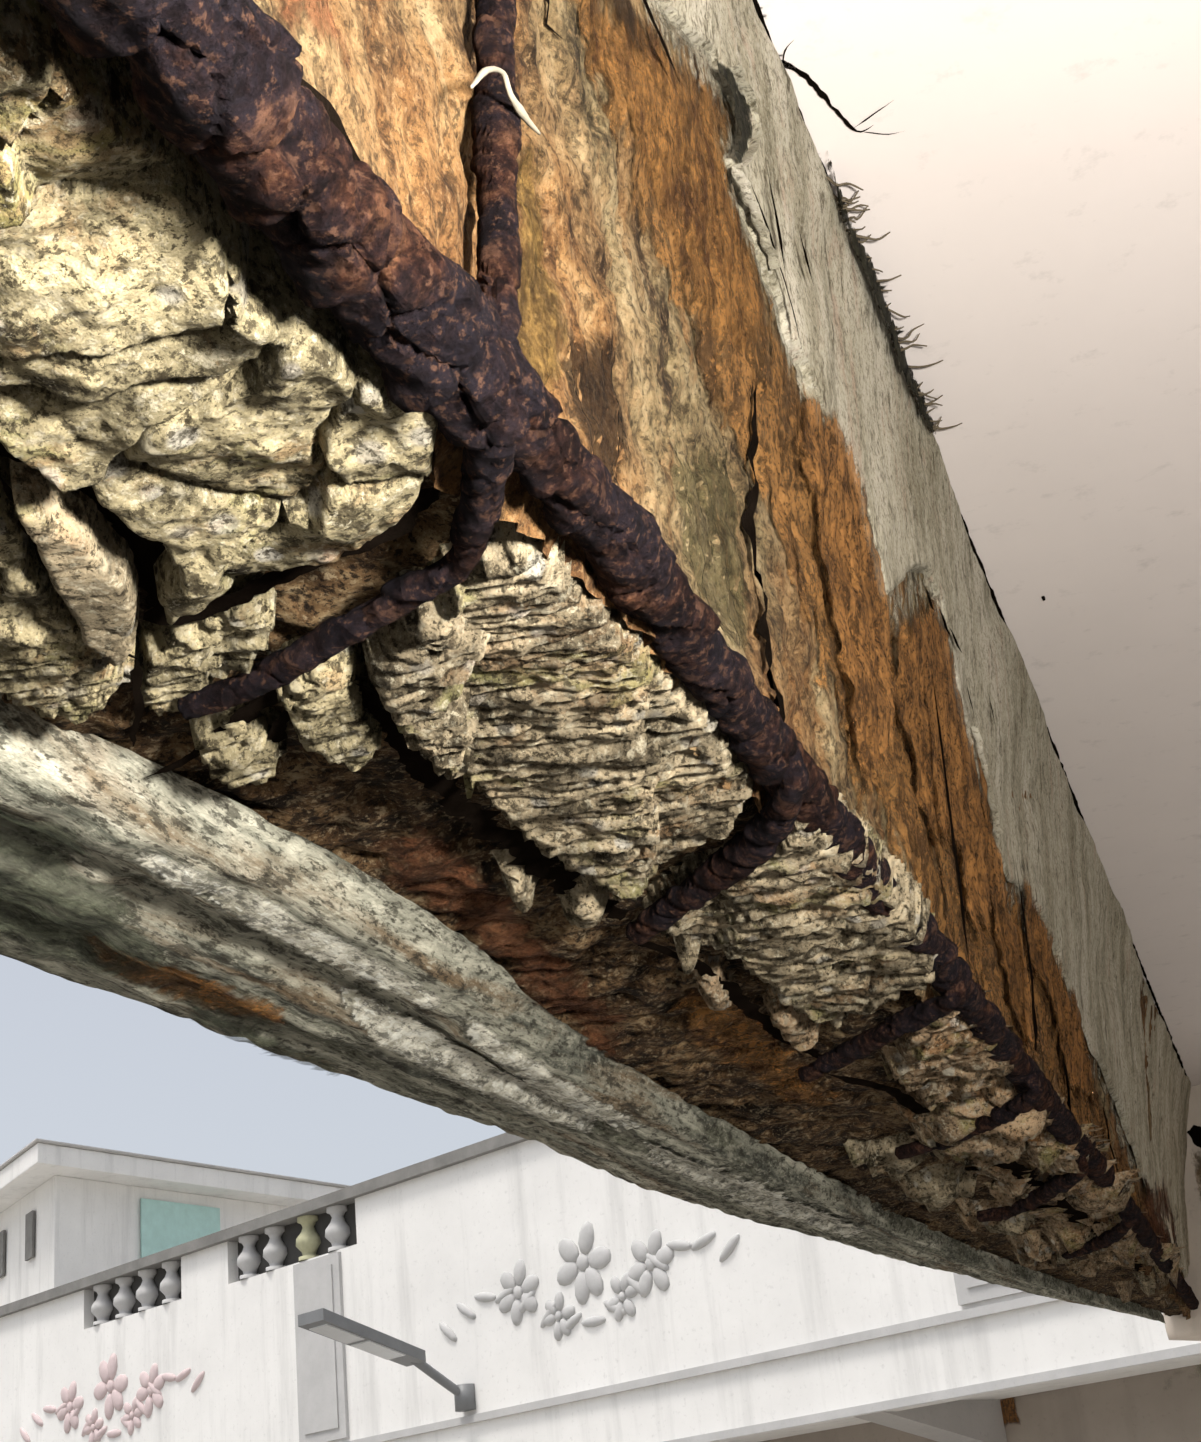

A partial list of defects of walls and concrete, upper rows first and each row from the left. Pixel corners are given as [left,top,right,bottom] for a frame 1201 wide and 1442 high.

crack [301,79,361,161]
crack [752,0,903,135]
corrosion [516,141,568,386]
spalling [0,0,753,929]
crack [741,366,785,722]
corrosion [578,0,1181,1257]
peeling [646,0,1201,1308]
crack [961,514,1006,624]
crack [1047,727,1085,822]
corrosion [89,933,285,1024]
peeling [130,853,872,1238]
corrosion [377,829,633,1055]